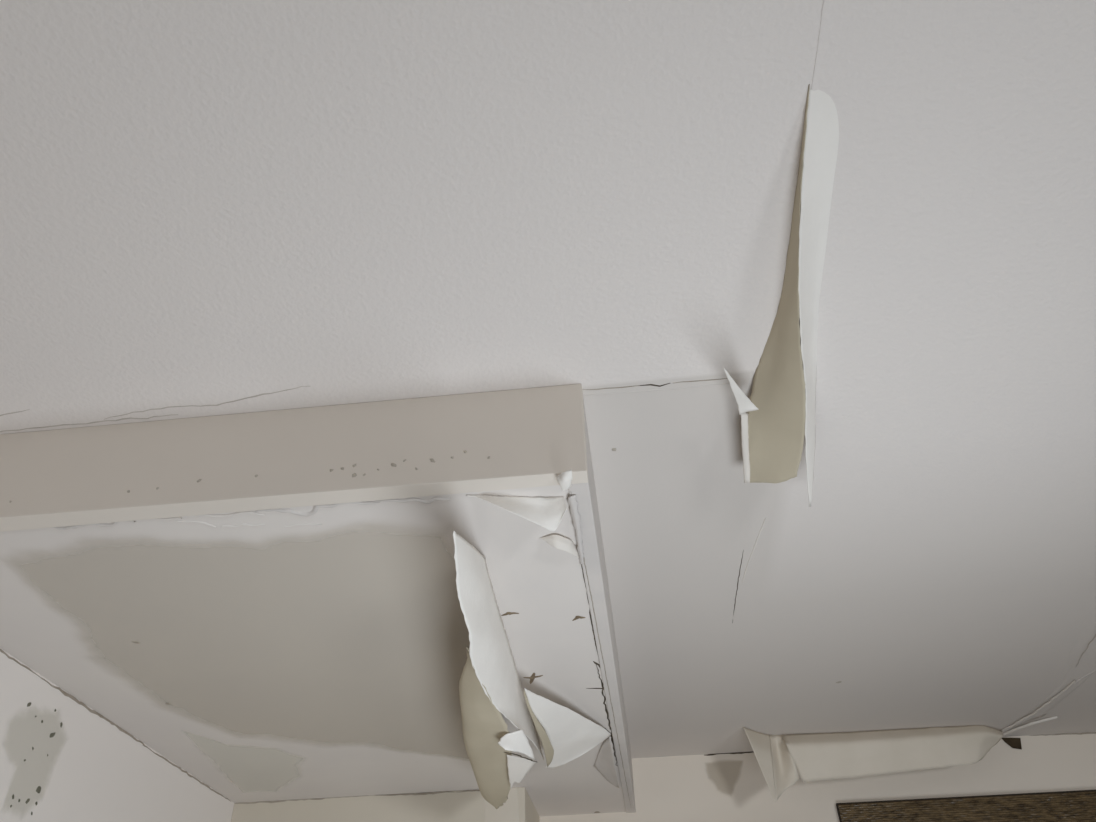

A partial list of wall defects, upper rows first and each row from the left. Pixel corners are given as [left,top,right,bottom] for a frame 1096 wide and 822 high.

peeling [466,469,584,564]
peeling [524,688,619,788]